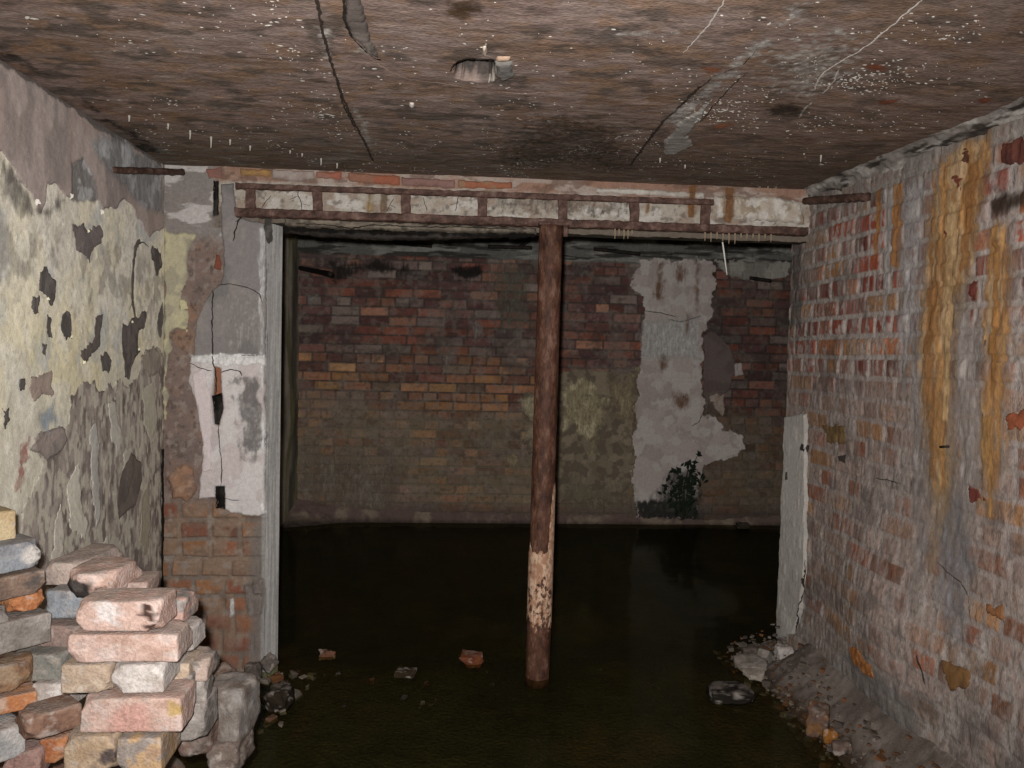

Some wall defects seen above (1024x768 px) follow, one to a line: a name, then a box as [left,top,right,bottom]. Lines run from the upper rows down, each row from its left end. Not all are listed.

crack [315,0,374,161]
spalling [450,58,515,83]
crack [629,3,807,165]
rust [725,188,734,223]
peeling [0,63,212,600]
crack [190,283,262,509]
peeling [709,393,725,416]
rust [917,136,991,531]
rust [980,222,1012,518]